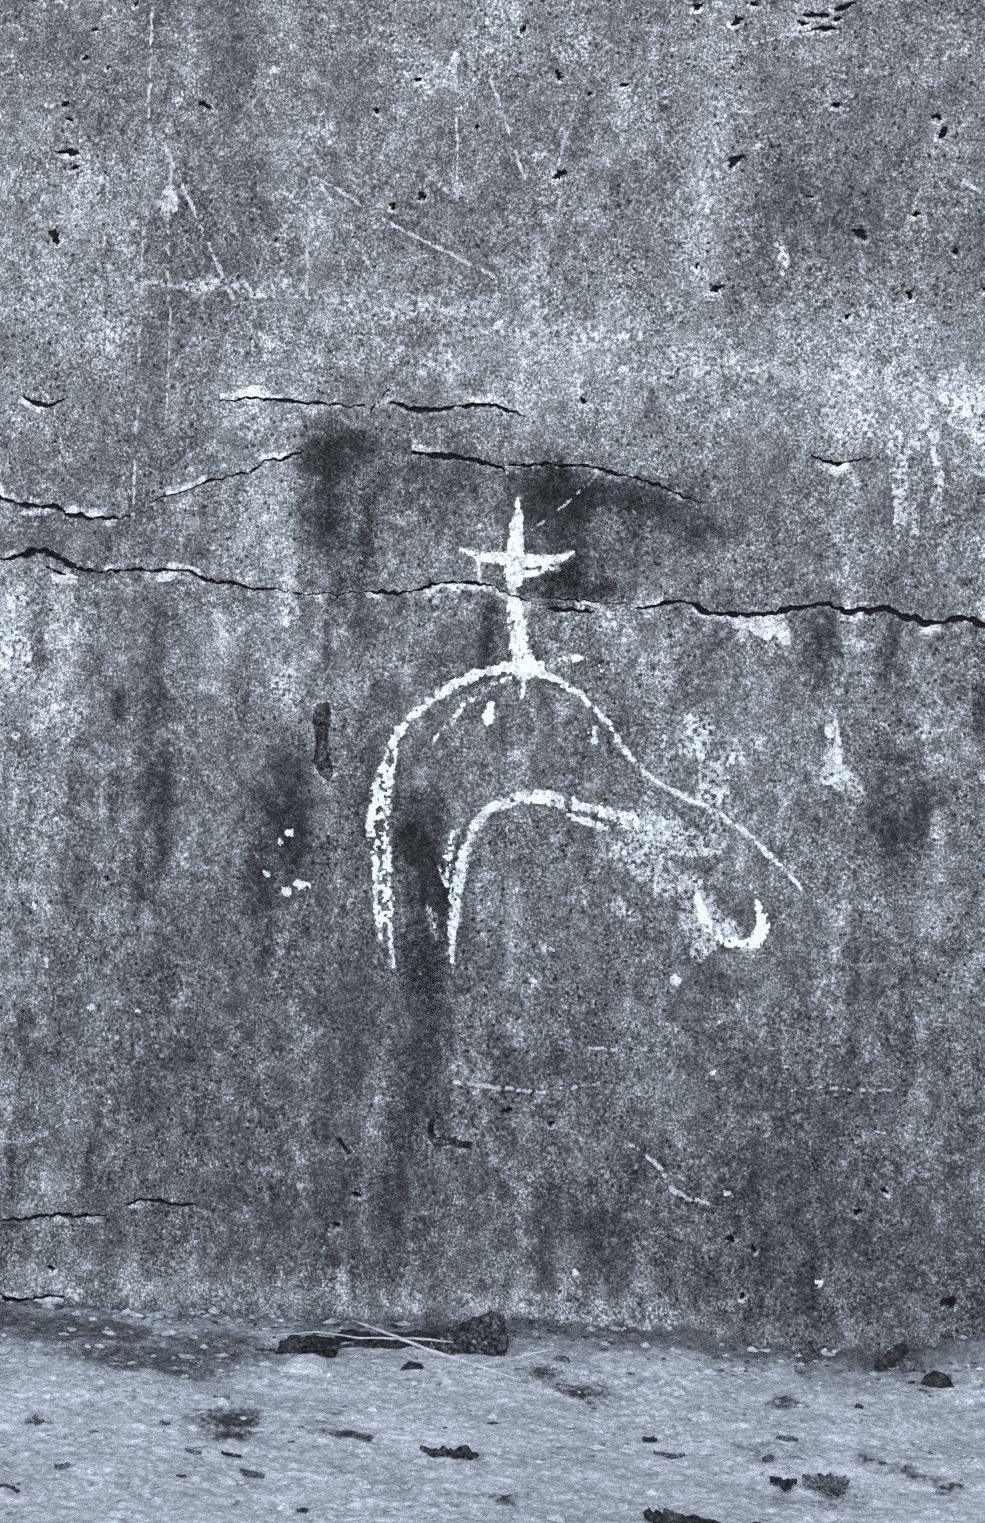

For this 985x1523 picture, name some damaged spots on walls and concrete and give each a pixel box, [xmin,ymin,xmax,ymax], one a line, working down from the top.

water stain [215,612,244,646]
water stain [266,654,305,711]
water stain [272,568,311,631]
water stain [296,424,391,667]
crack [0,384,985,637]
water stain [242,744,312,922]
water stain [394,791,458,1120]
crack [0,1192,197,1229]